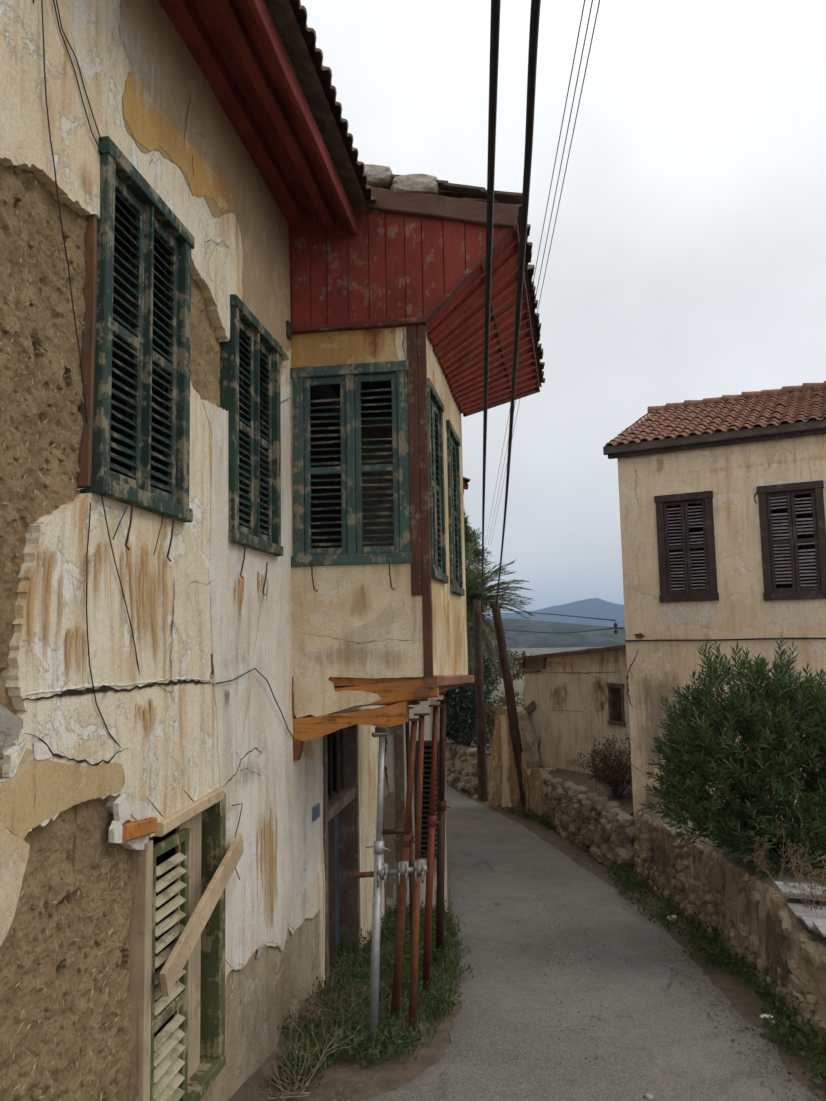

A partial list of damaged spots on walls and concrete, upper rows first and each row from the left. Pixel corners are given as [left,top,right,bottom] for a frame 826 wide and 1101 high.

peeling [70,0,94,84]
peeling [119,0,407,369]
flaking render [0,163,88,715]
flaking render [0,741,153,1101]
crack [25,733,158,793]
crack [22,579,214,732]